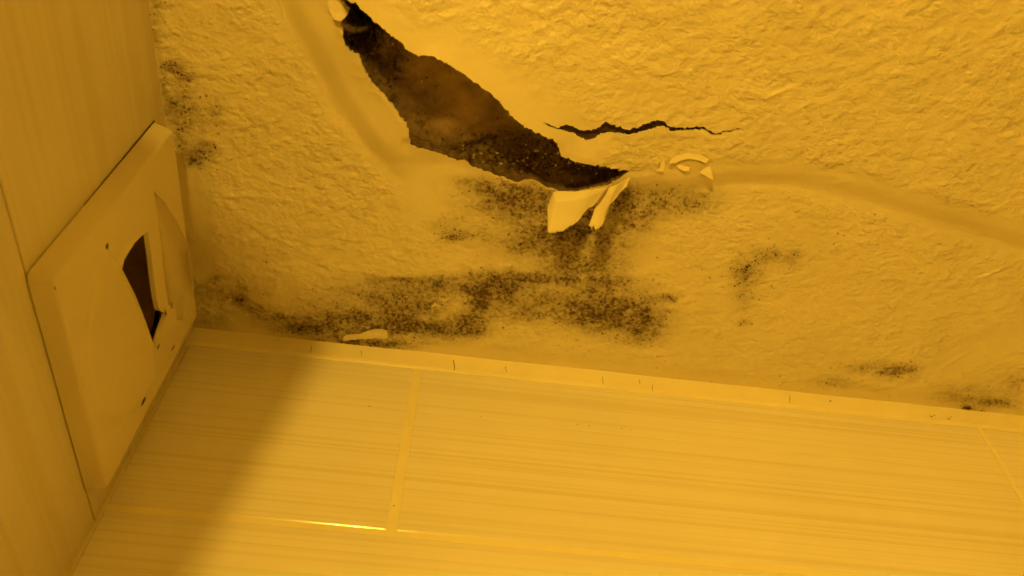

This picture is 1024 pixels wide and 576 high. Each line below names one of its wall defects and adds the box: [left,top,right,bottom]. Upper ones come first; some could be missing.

spalling [328,0,630,233]
crack [546,120,740,140]
peeling [656,153,713,180]
mould [232,181,705,348]